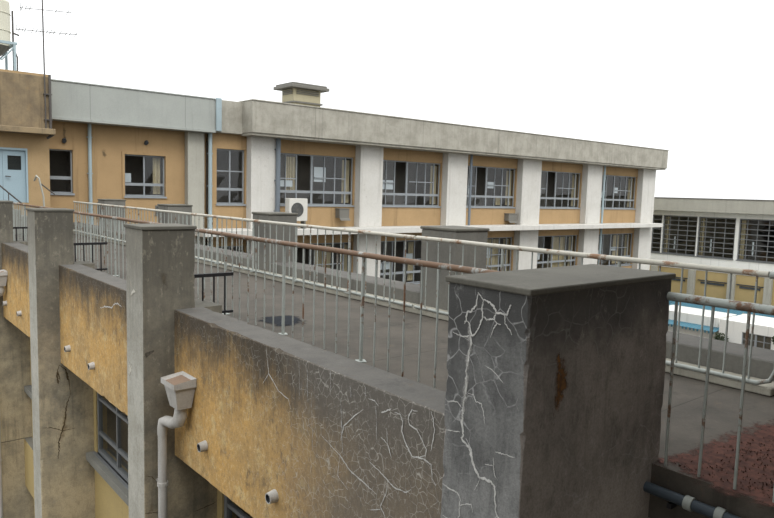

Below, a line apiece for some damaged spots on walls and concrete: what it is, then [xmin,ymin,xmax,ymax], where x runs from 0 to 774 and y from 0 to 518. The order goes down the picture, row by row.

crack [49,365,74,458]
crack [322,292,515,518]
corrosion [555,354,567,407]